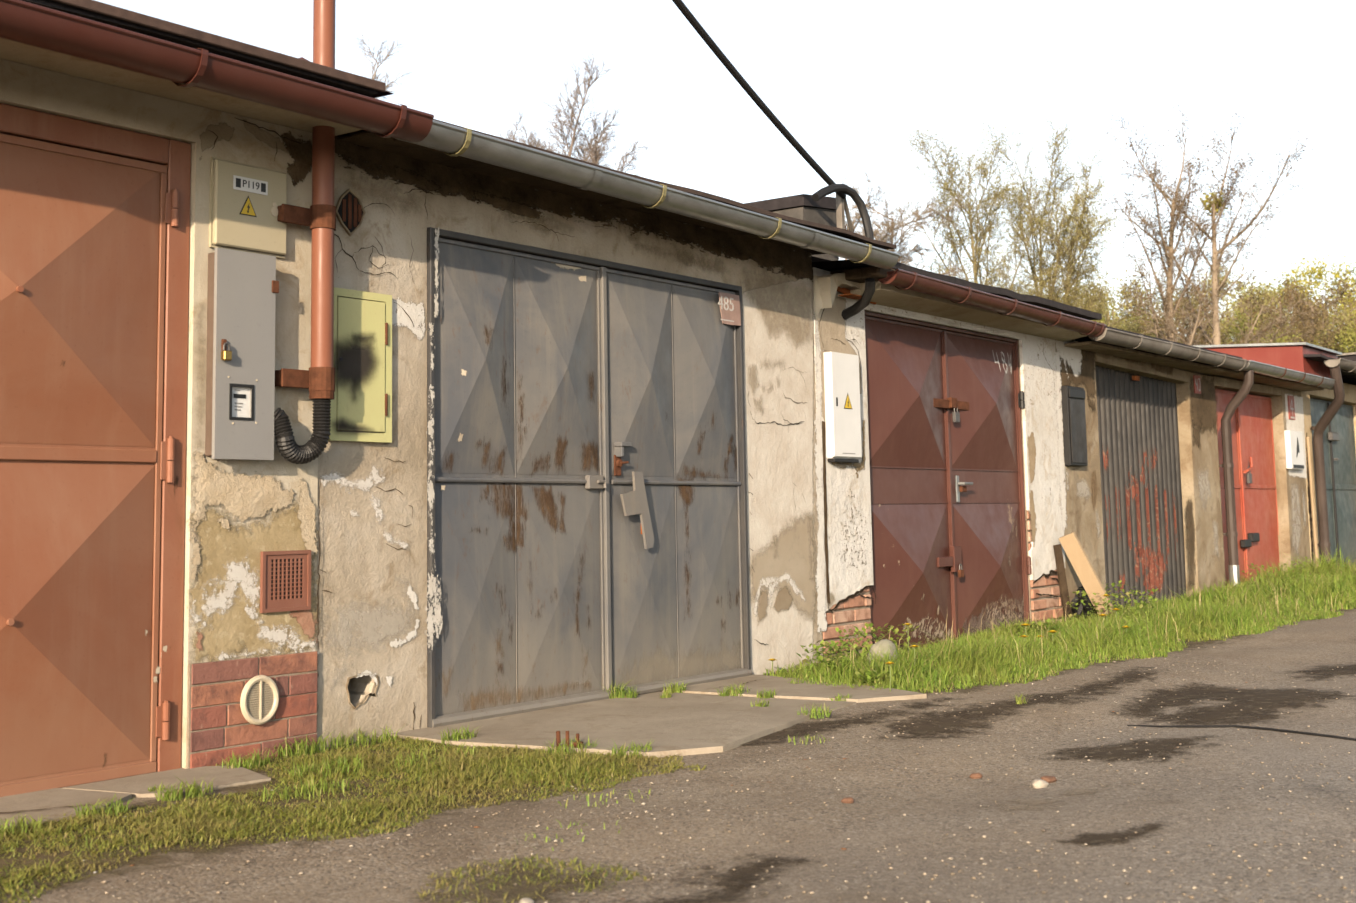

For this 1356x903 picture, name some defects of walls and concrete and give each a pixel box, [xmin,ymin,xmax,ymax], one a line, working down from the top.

spalling [200,120,312,187]
peeling [392,227,446,651]
corrosion [477,436,600,551]
corrosion [678,415,737,503]
peeling [813,293,862,634]
peeling [189,448,321,662]
water stain [750,514,817,621]
spalling [346,670,392,709]